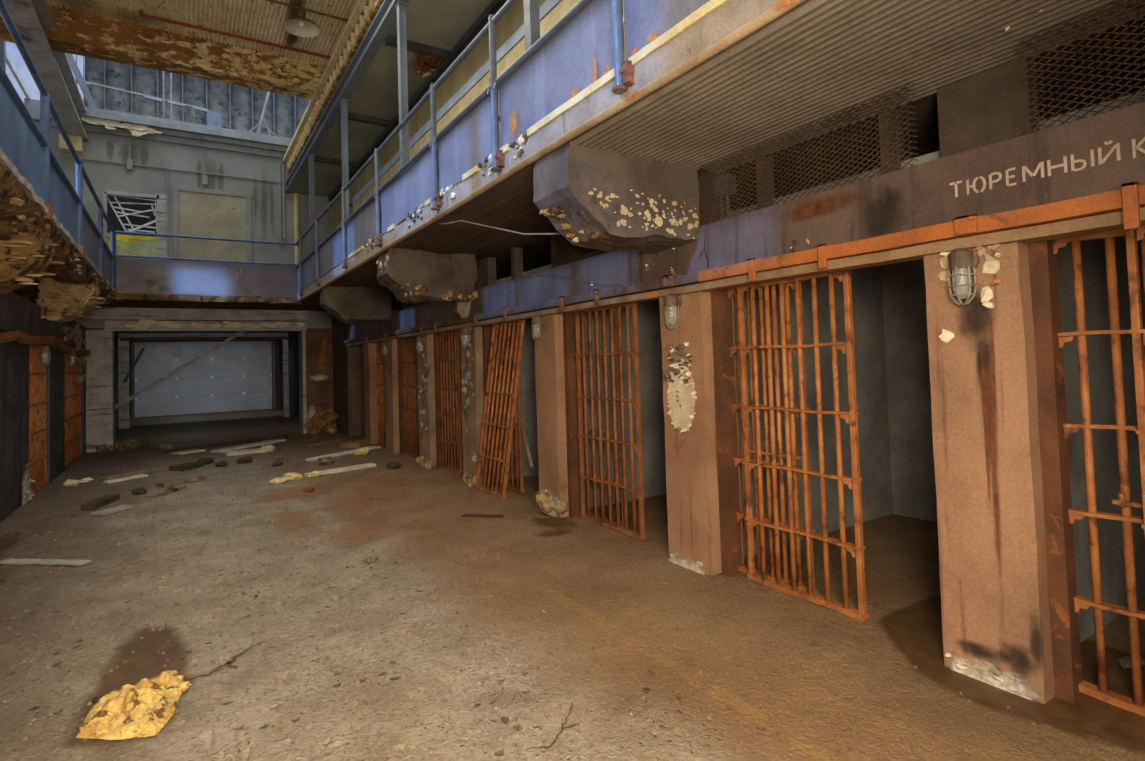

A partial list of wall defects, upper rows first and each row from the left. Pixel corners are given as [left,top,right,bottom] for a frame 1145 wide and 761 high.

spalling [9,198,114,306]
spalling [367,236,389,271]
spalling [439,185,455,208]
spalling [477,154,493,176]
spalling [510,132,529,159]
spalling [539,204,598,243]
peeling [588,188,699,239]
peeling [441,290,478,411]
peeling [662,342,697,434]
corrosion [981,339,1000,559]
leakage [69,627,188,744]
leakage [881,597,1145,751]